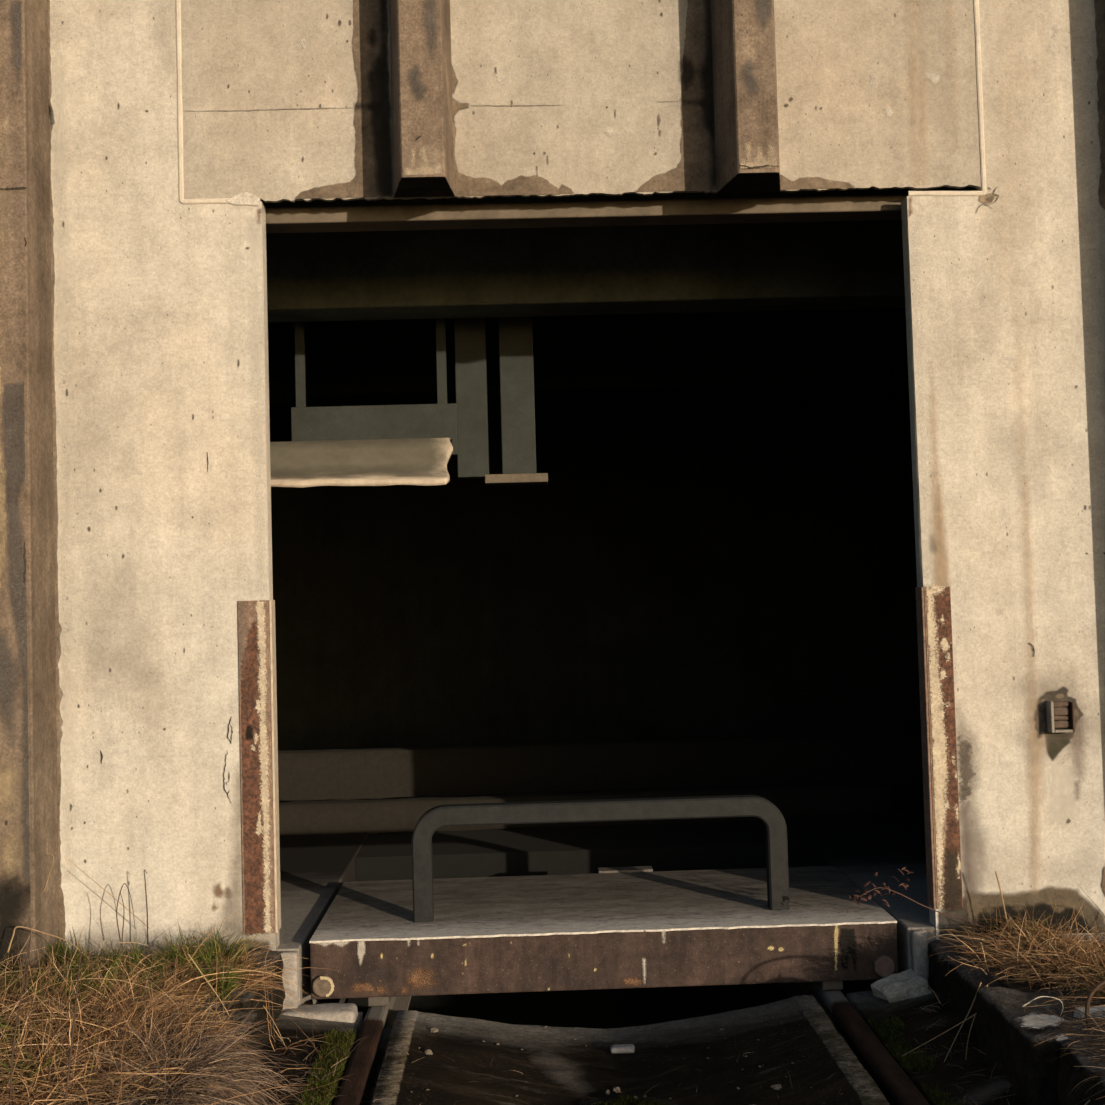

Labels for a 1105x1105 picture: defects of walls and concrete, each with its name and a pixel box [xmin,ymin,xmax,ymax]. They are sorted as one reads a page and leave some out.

leakage [294,0,392,199]
leakage [405,64,574,196]
leakage [635,0,717,192]
leakage [757,0,770,23]
leakage [740,144,855,189]
leakage [1094,0,1105,210]
leakage [0,384,31,977]
crack [223,716,233,802]
rust [240,621,267,935]
rust [933,587,963,911]
leakage [1046,731,1070,760]
leakage [939,887,1105,939]